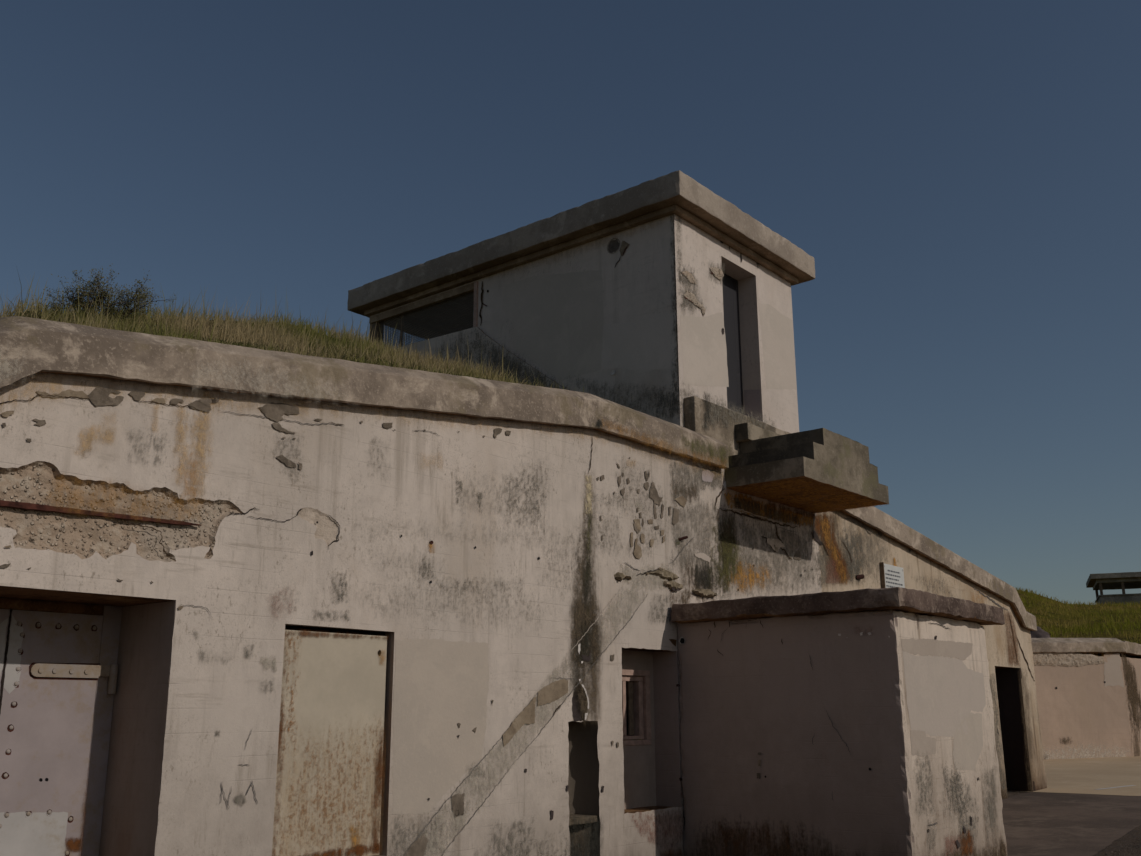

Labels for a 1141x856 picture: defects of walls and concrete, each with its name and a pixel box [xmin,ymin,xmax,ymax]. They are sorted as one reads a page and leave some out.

crack [0,394,88,404]
peeling [36,387,219,412]
peeling [258,402,299,440]
spalling [0,461,243,562]
spalling [296,507,340,546]
peeling [595,457,671,559]
damp [651,395,816,623]
damp [571,475,601,720]
rust [278,630,362,769]
rust [375,740,384,806]
rust [66,838,82,852]
rust [303,821,380,856]